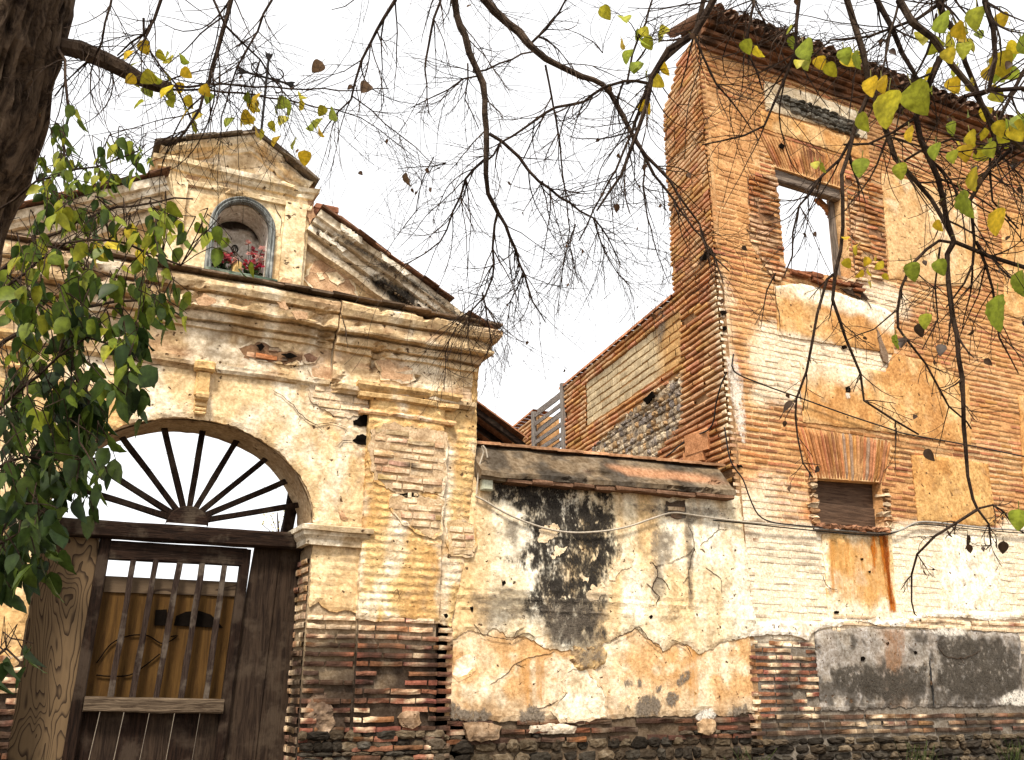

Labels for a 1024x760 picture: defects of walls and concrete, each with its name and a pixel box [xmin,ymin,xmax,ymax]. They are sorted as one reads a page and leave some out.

spalling [238,341,369,418]
spalling [367,421,477,558]
damp [476,491,634,647]
crack [648,525,725,604]
corrosion [871,535,896,612]
crack [474,624,555,684]
crack [612,627,692,656]
damp [830,628,1024,705]